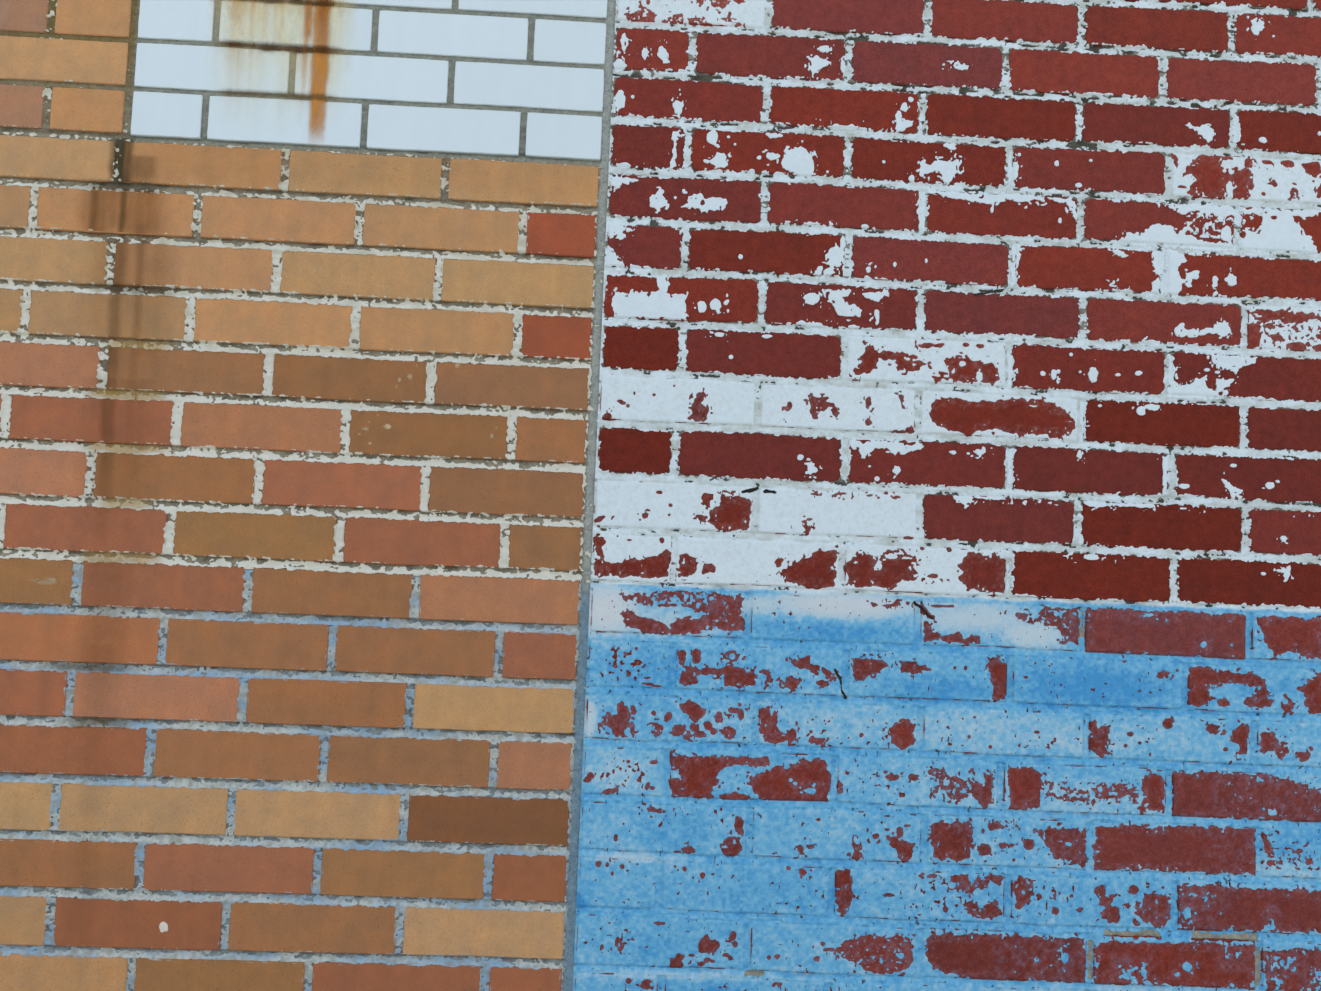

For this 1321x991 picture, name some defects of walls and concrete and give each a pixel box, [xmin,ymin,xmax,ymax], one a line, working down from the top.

corrosion [225,0,333,130]
peeling [614,0,746,72]
peeling [650,187,728,214]
peeling [748,119,864,181]
peeling [908,143,1082,236]
peeling [1107,105,1321,302]
peeling [611,274,733,359]
peeling [782,219,1214,518]
peeling [1132,307,1321,416]
peeling [693,490,753,533]
peeling [583,515,931,818]
peeling [774,527,1321,991]